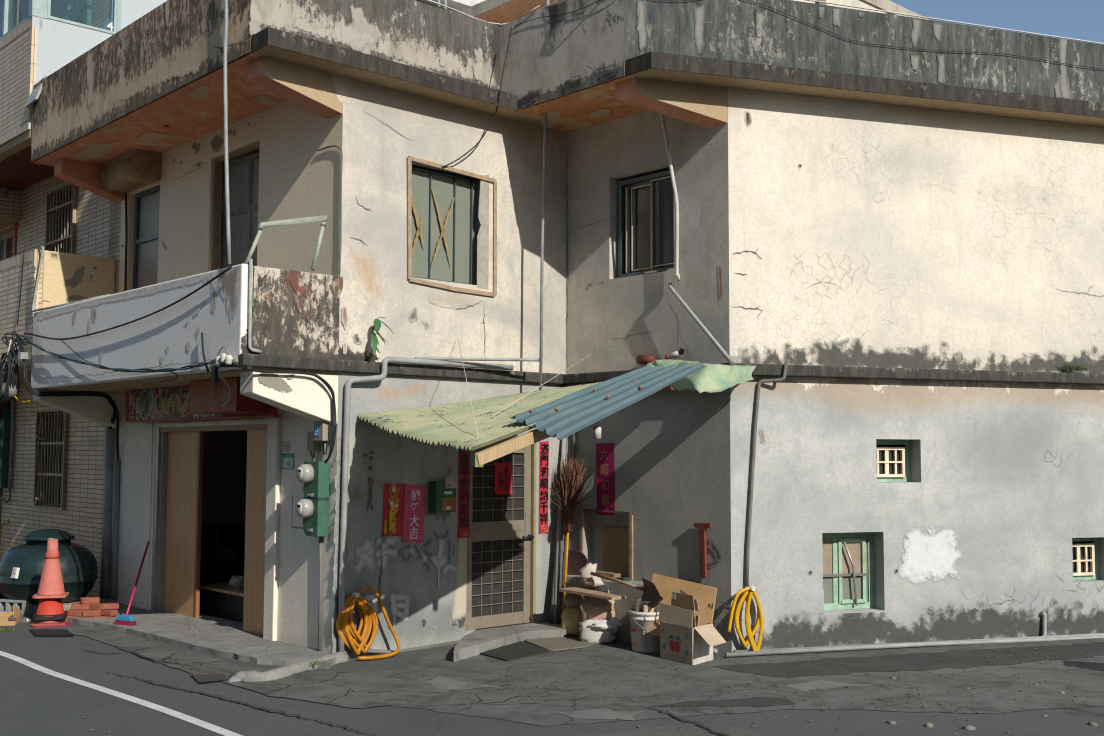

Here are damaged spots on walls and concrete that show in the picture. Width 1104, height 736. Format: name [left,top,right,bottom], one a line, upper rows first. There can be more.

water stain [543,0,588,49]
water stain [564,78,582,94]
water stain [636,0,647,51]
water stain [693,5,705,54]
water stain [755,11,765,37]
water stain [818,6,842,27]
water stain [911,19,946,84]
water stain [1054,38,1071,99]
peeling [173,116,263,167]
peeling [63,261,98,302]
water stain [664,198,1104,487]
water stain [732,574,1104,652]